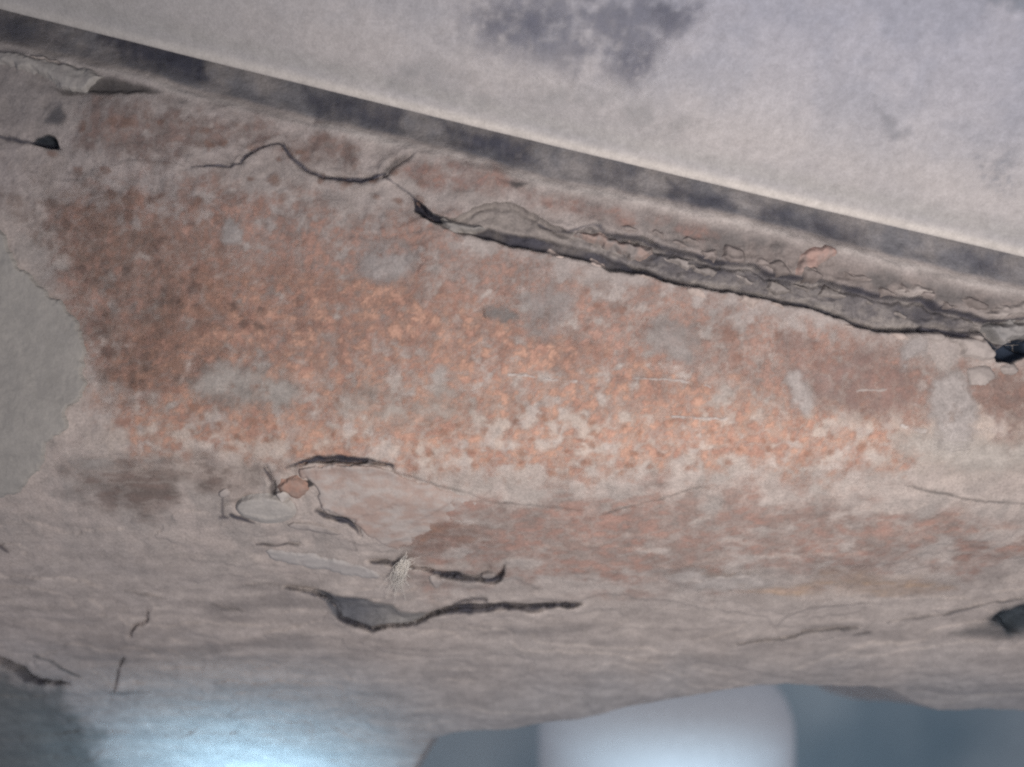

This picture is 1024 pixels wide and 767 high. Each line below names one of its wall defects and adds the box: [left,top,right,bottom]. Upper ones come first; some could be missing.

crack [0,135,59,149]
crack [205,144,391,183]
flaking render [0,230,88,498]
rust [87,272,919,505]
spalling [414,200,1024,452]
flaking render [235,491,296,524]
spalling [295,455,486,550]
spalling [992,605,1024,634]